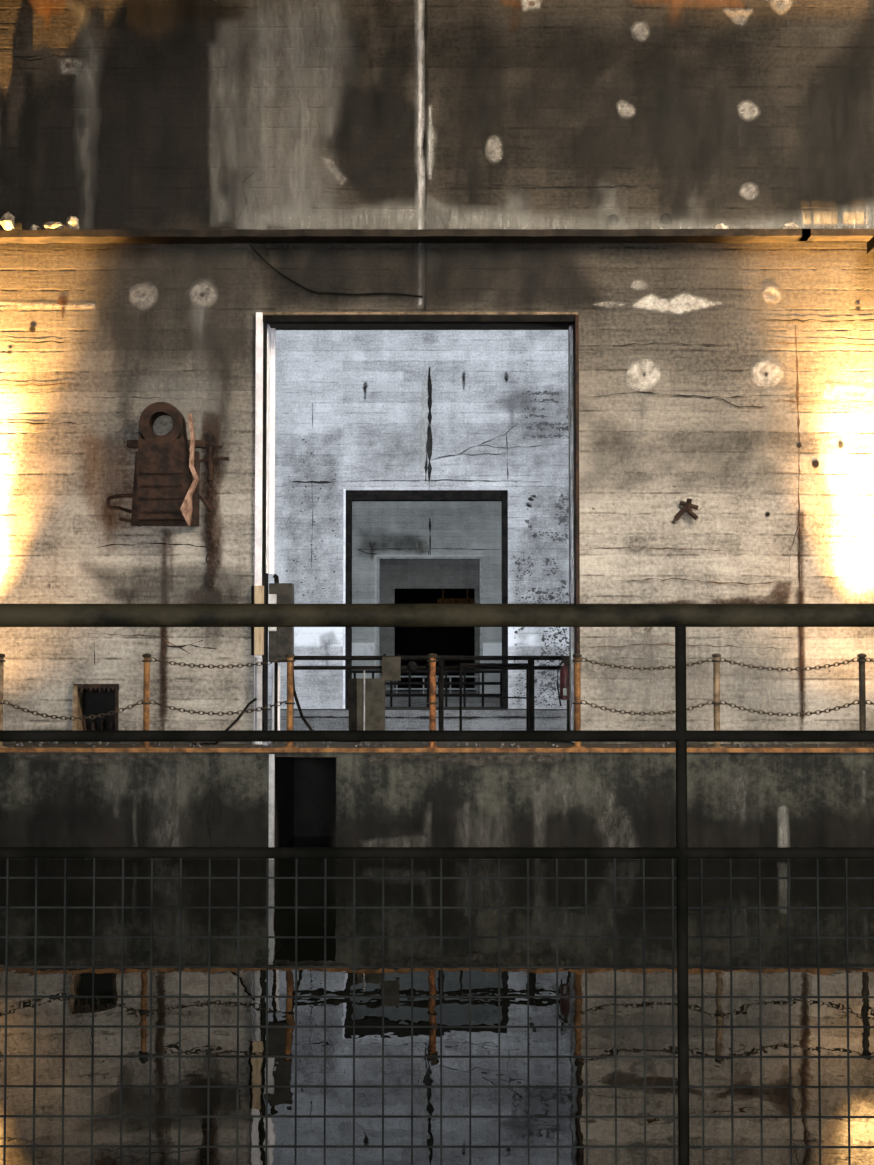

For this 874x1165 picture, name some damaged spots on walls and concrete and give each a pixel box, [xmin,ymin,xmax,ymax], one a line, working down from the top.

damp [0,0,874,230]
damp [107,251,248,457]
damp [94,569,242,604]
damp [712,582,791,604]
damp [0,777,266,847]
damp [337,772,874,860]